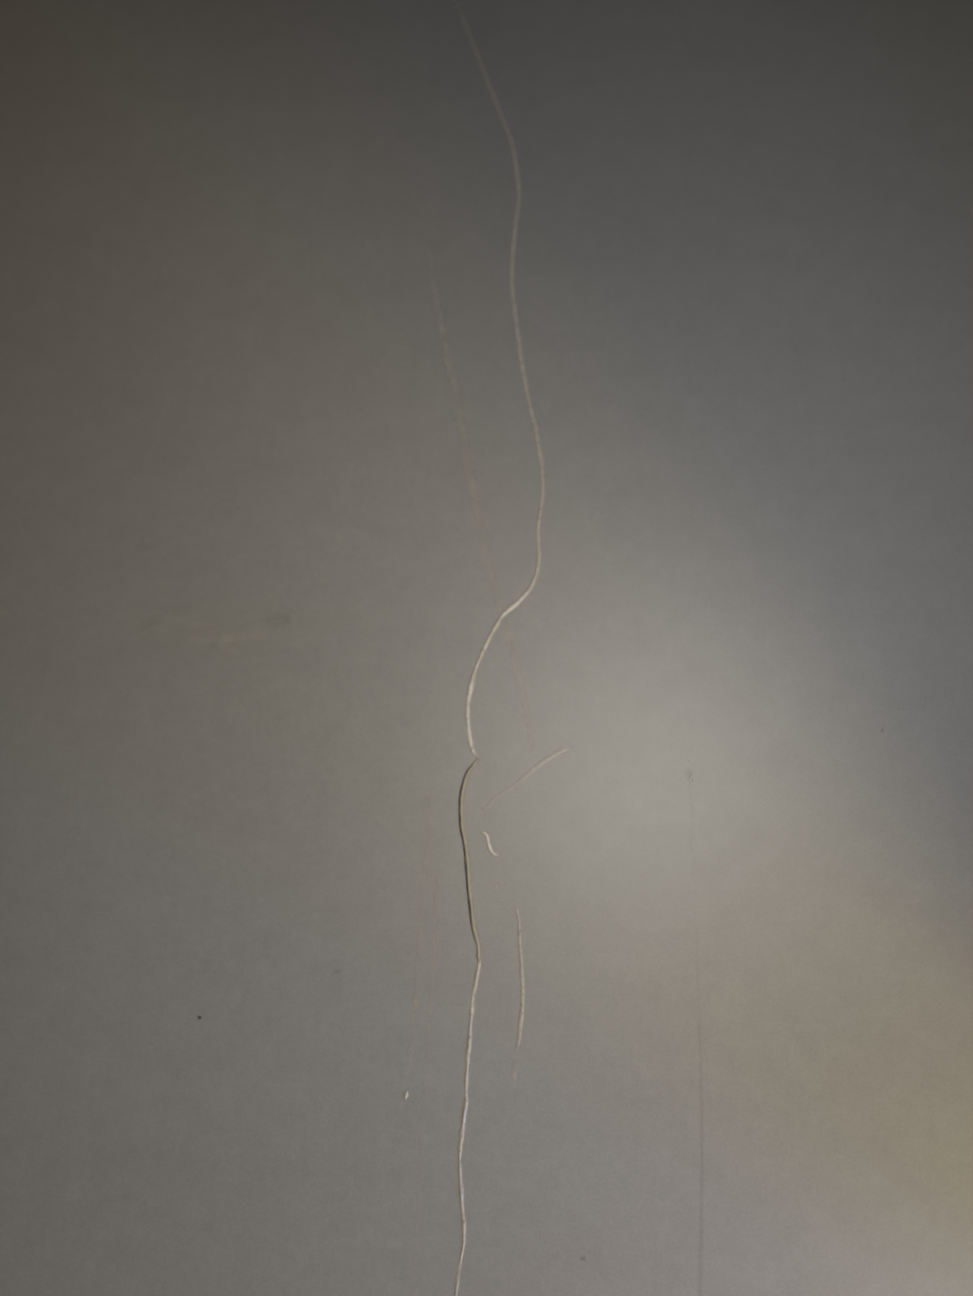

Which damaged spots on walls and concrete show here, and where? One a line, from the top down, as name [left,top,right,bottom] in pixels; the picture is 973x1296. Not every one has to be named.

crack [456,32,544,1283]